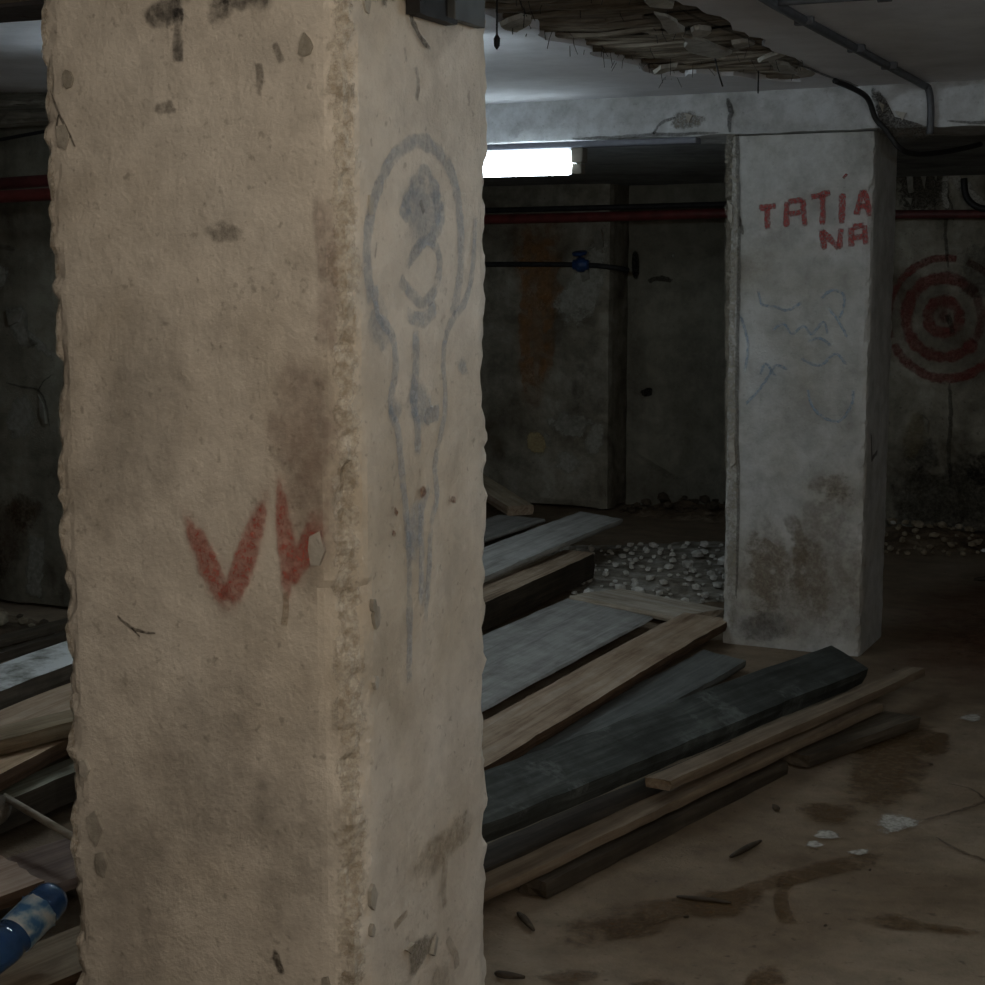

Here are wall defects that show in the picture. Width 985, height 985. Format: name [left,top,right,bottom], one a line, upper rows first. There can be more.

spalling [298,32,314,57]
spalling [485,0,815,93]
spalling [308,0,381,985]
water stain [567,854,873,942]